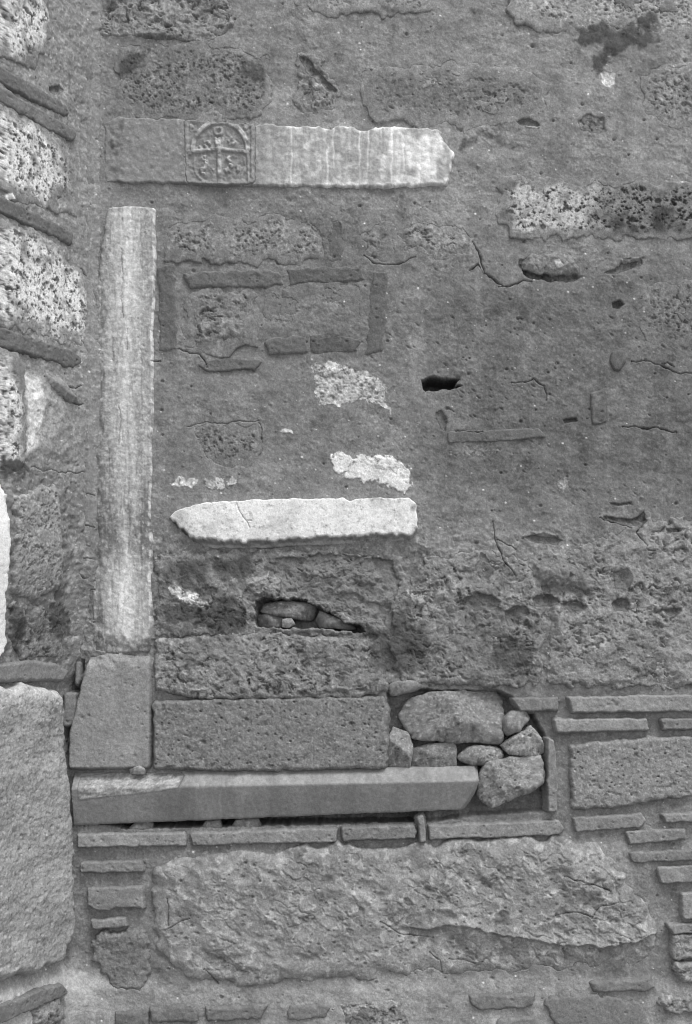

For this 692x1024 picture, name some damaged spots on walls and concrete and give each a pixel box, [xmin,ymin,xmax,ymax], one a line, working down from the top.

crack [470,242,531,289]
peeling [311,361,392,415]
crack [631,358,692,376]
peeling [330,452,413,494]
crack [491,522,517,577]
crack [600,517,648,546]